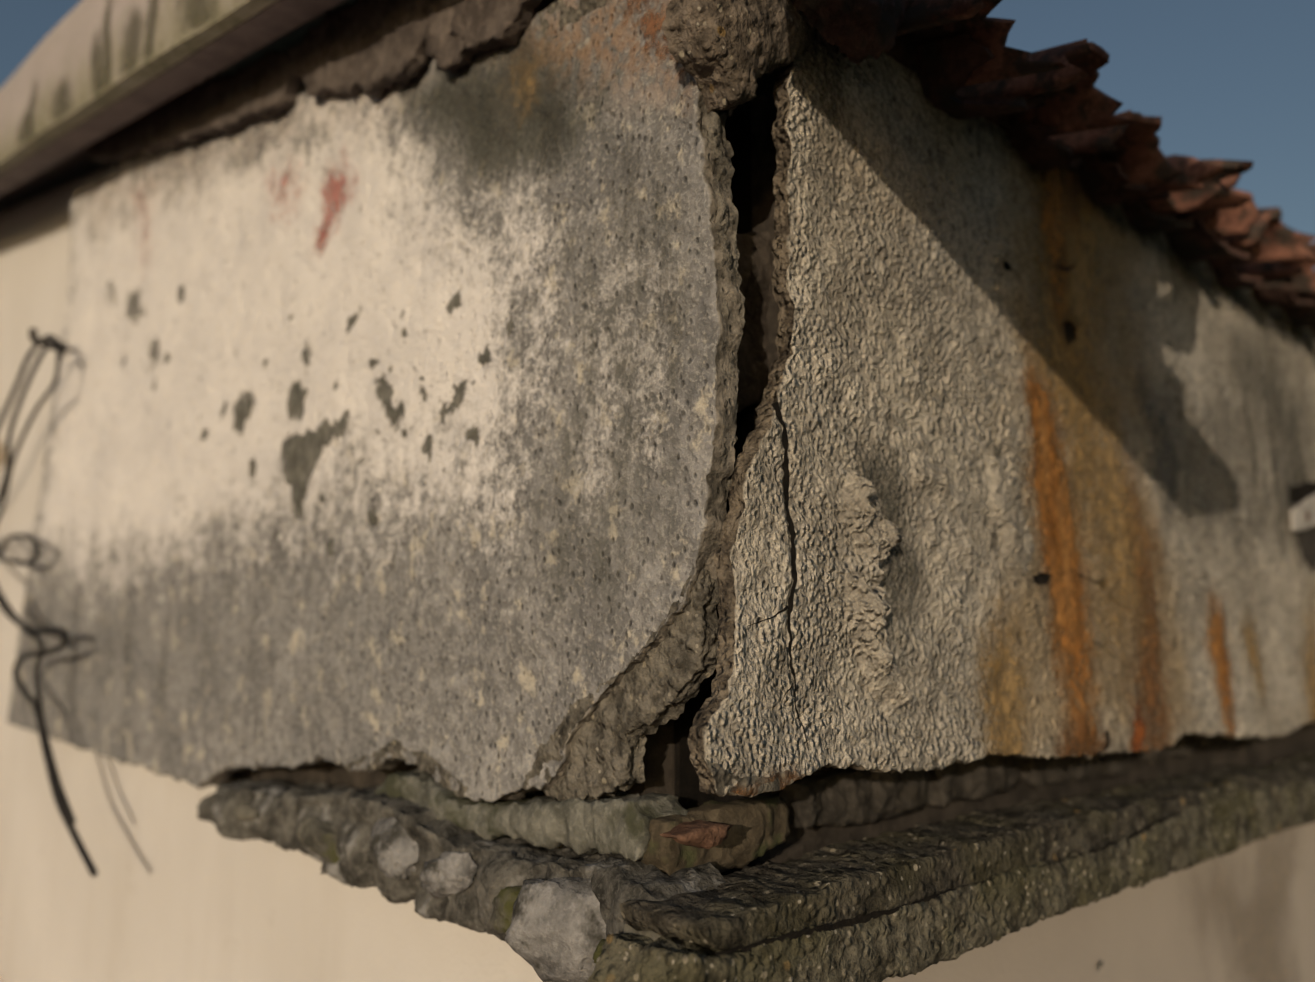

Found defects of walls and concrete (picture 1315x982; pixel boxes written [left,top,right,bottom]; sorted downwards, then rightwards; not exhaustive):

damp [92,0,157,91]
crack [702,100,752,234]
peeling [221,390,256,436]
peeling [280,338,349,520]
peeling [369,359,407,438]
peeling [419,377,467,463]
crack [716,401,809,750]
corrosion [1025,367,1171,757]
crack [674,661,748,809]
corrosion [980,627,1025,756]
corrosion [1207,595,1235,737]
crack [720,856,760,875]